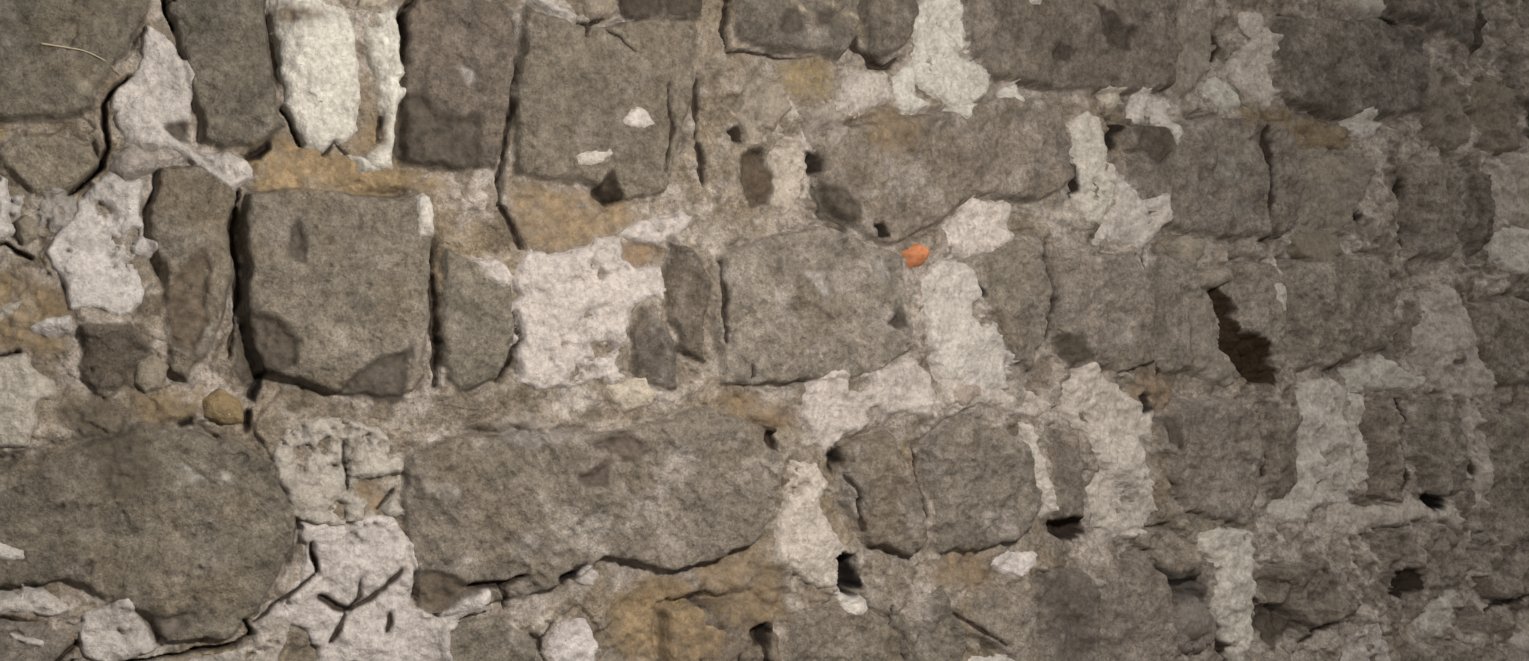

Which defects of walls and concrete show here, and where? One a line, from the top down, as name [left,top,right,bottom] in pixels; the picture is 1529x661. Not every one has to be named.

crack [68,78,127,196]
crack [494,73,521,249]
crack [0,243,32,260]
crack [494,312,522,382]
crack [56,641,77,661]
crack [126,543,403,661]